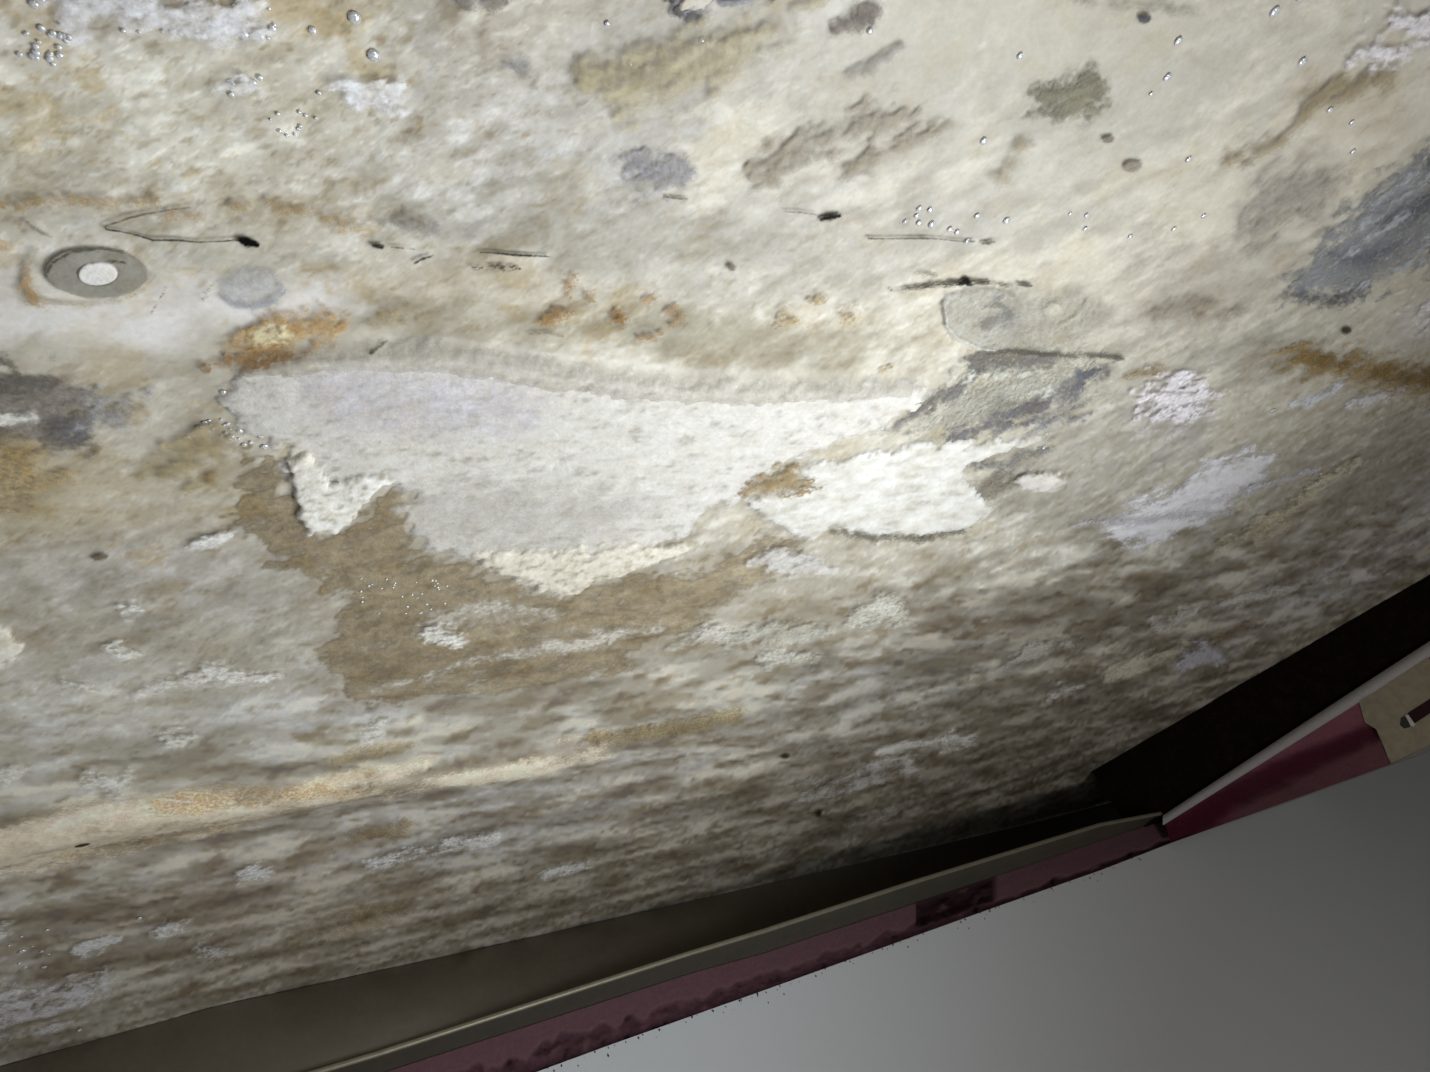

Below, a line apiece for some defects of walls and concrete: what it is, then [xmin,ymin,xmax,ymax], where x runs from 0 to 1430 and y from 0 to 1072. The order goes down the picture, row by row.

damp [573,0,783,130]
damp [1225,6,1430,167]
crack [104,207,260,248]
crack [868,237,1033,291]
corrosion [201,300,350,373]
mould [0,358,151,455]
efflorescence [1130,371,1224,431]
corrosion [1263,342,1430,409]
peeling [1015,472,1066,492]
peeling [217,339,1042,718]
efflorescence [666,593,909,671]
efflorescence [797,728,977,802]